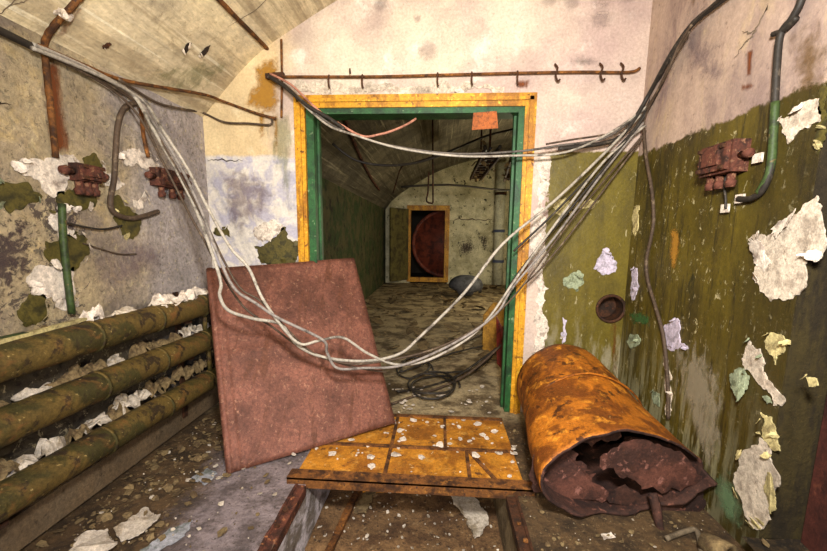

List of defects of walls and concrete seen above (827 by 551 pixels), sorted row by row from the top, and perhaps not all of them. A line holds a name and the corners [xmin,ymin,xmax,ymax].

peeling [119,148,159,171]
peeling [777,86,827,155]
peeling [0,153,150,327]
peeling [529,156,600,354]
peeling [594,248,617,275]
peeling [630,267,639,301]
peeling [748,195,827,301]
peeling [651,318,689,416]
peeling [729,332,791,406]
peeling [732,412,781,530]